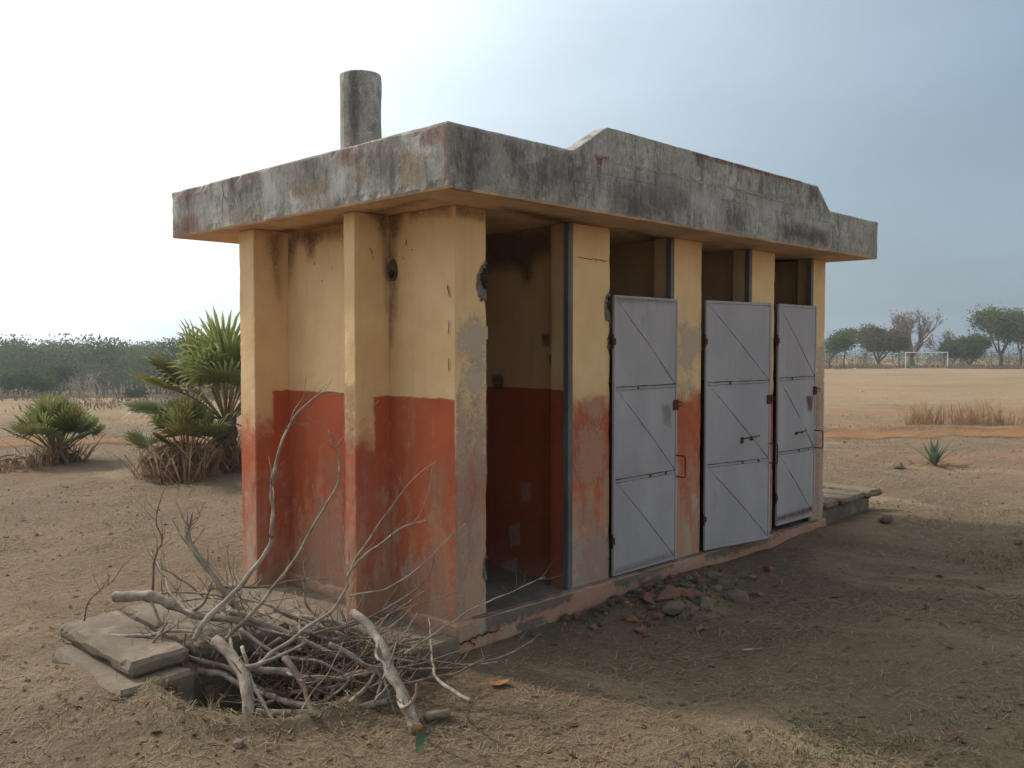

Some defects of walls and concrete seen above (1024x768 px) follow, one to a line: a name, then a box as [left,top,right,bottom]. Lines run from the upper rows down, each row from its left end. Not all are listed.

spalling [477,260,488,305]
peeling [456,317,503,592]
crack [459,629,501,646]